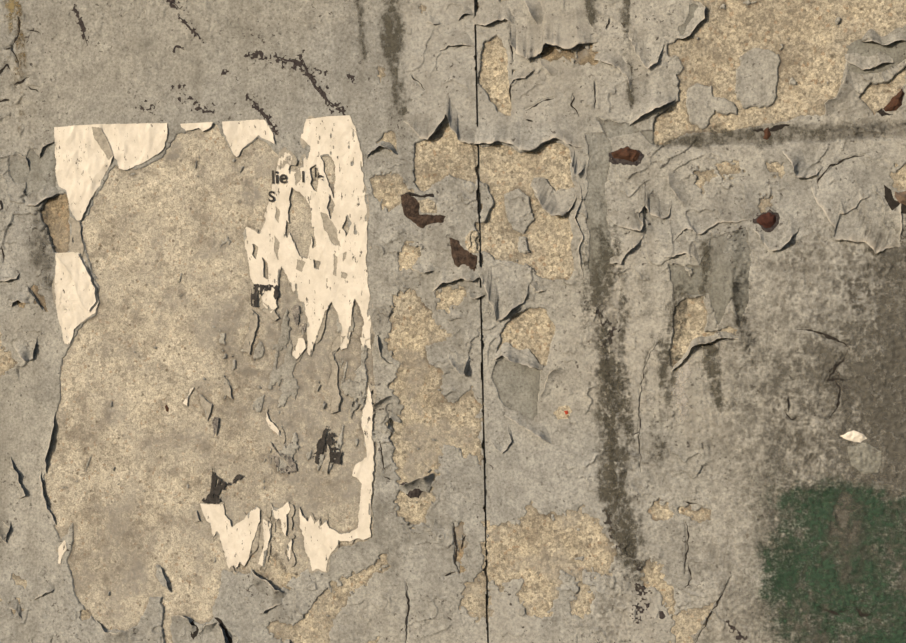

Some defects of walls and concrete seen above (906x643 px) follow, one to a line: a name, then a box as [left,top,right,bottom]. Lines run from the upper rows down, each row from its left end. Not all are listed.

peeling [7,135,70,253]
peeling [6,454,26,498]
peeling [0,331,37,376]
peeling [11,284,48,312]
peeling [33,125,391,643]
damp [584,224,645,588]
peeling [367,0,906,529]
damp [759,230,906,643]
peeling [9,573,27,618]
peeling [453,501,716,643]
spalling [725,615,748,640]